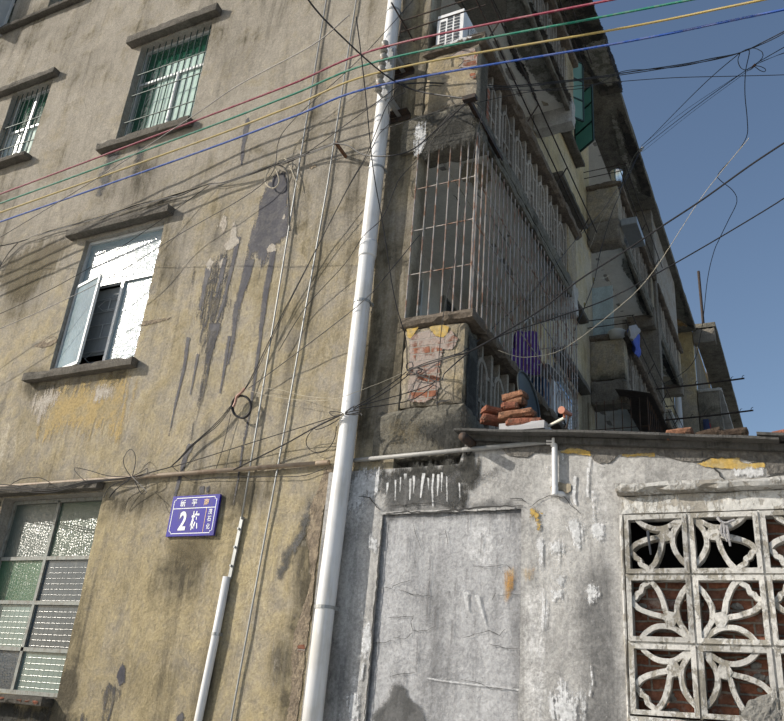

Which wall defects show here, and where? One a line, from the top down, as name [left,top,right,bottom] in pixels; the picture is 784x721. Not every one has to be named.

peeling [504,26,548,106]
peeling [529,2,572,102]
flaking render [406,325,458,403]
damp [347,335,497,514]
peeling [476,442,784,477]
crack [358,495,577,721]
damp [372,685,425,721]